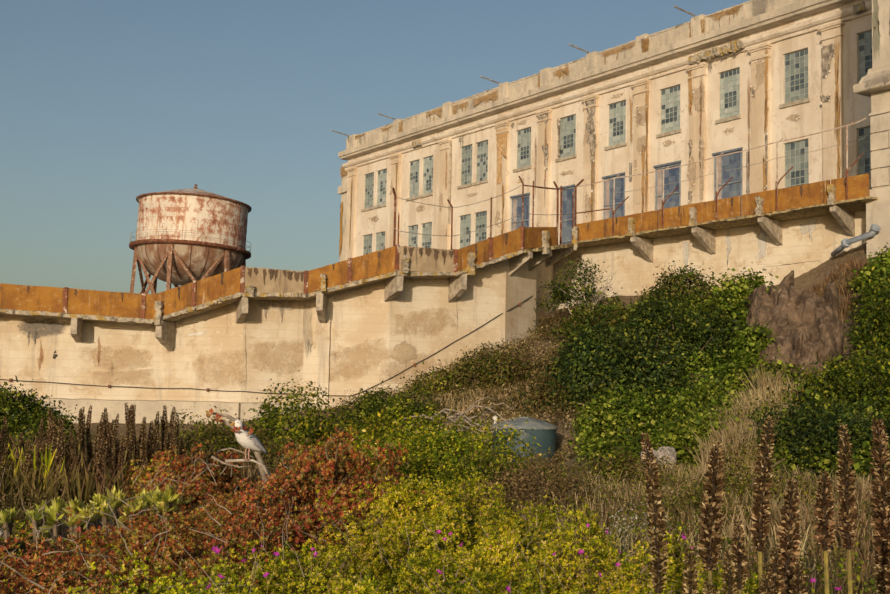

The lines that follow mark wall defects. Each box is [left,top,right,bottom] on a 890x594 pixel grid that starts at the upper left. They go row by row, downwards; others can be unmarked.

damp [20,319,66,345]